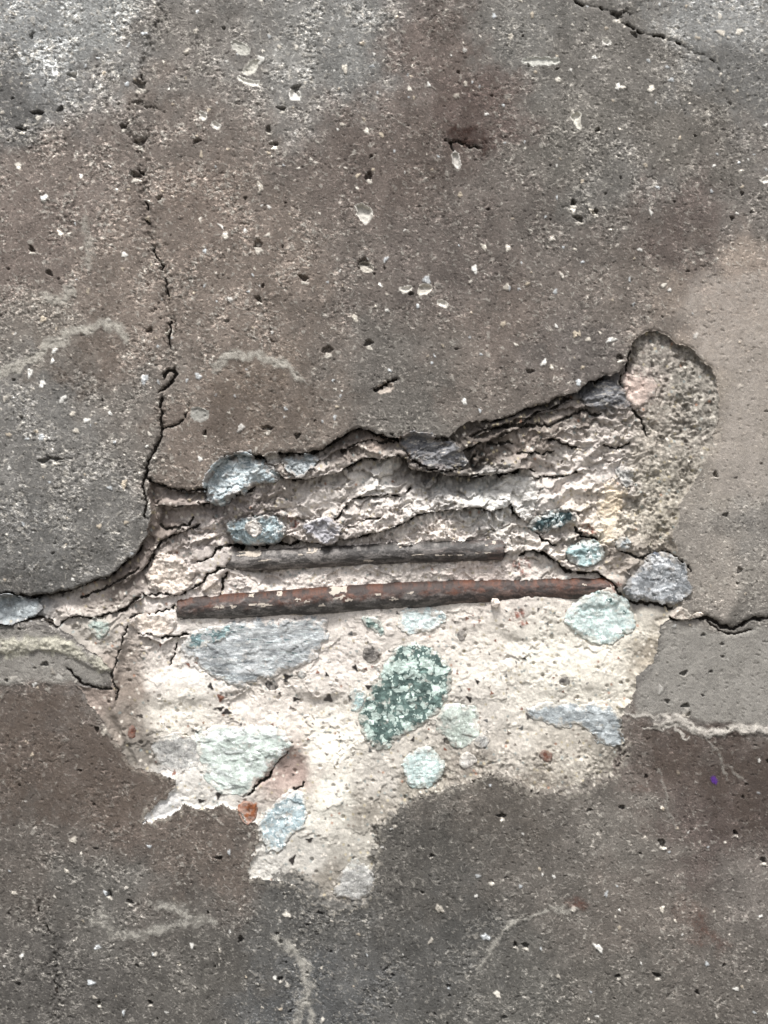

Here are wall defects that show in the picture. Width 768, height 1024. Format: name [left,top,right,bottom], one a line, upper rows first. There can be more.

crack [625,23,681,46]
crack [141,202,207,518]
crack [0,590,65,629]
spalling [0,331,720,910]
crack [66,668,112,690]